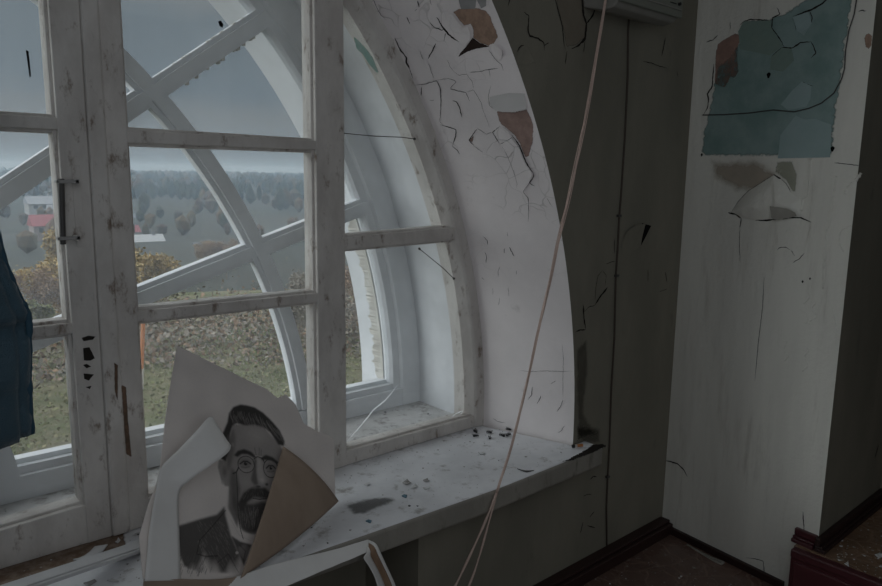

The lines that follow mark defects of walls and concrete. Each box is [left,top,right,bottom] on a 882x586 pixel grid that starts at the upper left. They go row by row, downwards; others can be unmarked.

peeling [439,0,502,61]
crack [395,0,595,219]
peeling [490,93,533,192]
peeling [82,336,95,389]